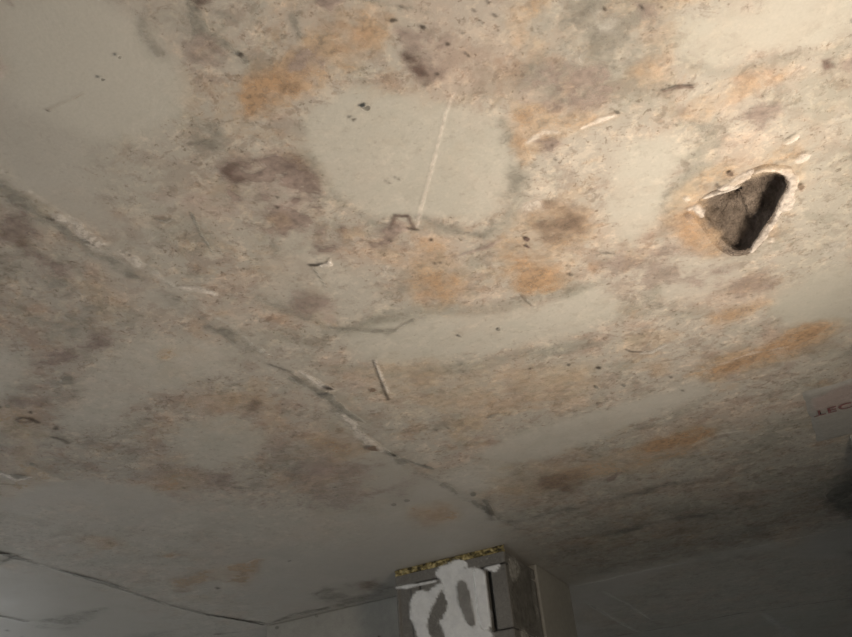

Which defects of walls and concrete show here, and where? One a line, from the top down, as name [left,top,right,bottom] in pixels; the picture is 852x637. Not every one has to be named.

crack [1,185,139,279]
leakage [219,154,321,236]
leakage [371,215,415,246]
spalling [687,156,810,256]
crack [208,326,236,343]
crack [292,376,455,492]
crack [0,552,29,562]
crack [53,568,262,625]